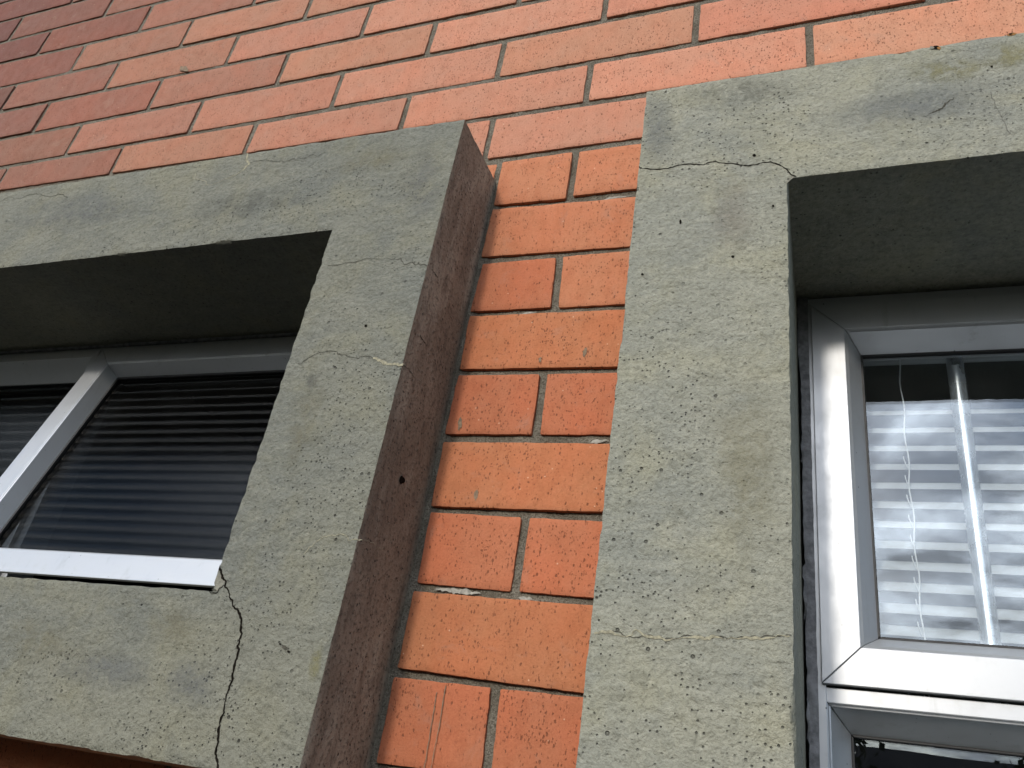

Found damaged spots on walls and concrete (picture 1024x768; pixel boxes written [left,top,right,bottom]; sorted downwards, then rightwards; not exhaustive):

crack [639,161,796,177]
crack [298,350,415,378]
crack [594,629,790,641]
crack [209,566,243,768]